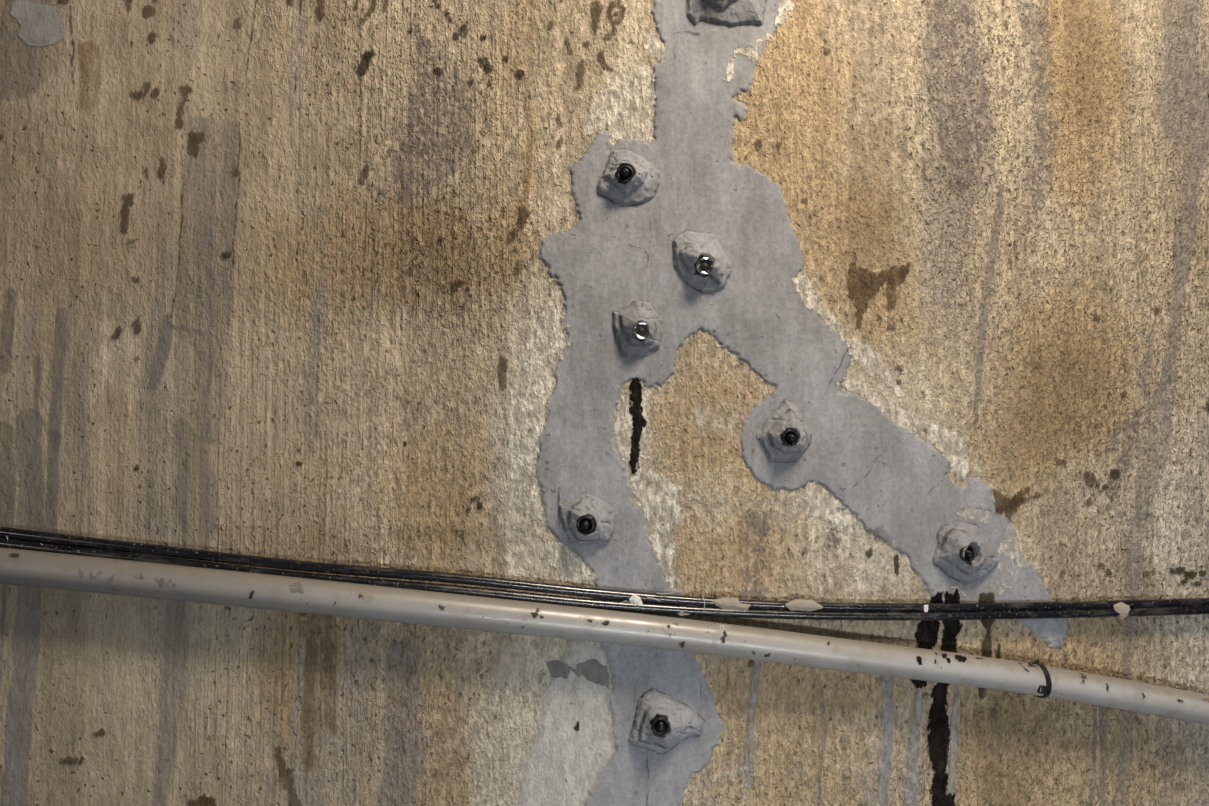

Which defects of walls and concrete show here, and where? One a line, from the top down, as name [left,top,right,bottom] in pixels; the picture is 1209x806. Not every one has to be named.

damp [924,0,991,188]
damp [1,586,40,806]
damp [0,313,67,533]
damp [696,660,761,806]
damp [792,255,978,481]
damp [905,679,958,806]
damp [915,620,963,653]
damp [929,540,1024,603]
damp [976,188,1003,394]
damp [980,620,1001,659]
damp [957,483,1043,523]
damp [1107,0,1209,495]